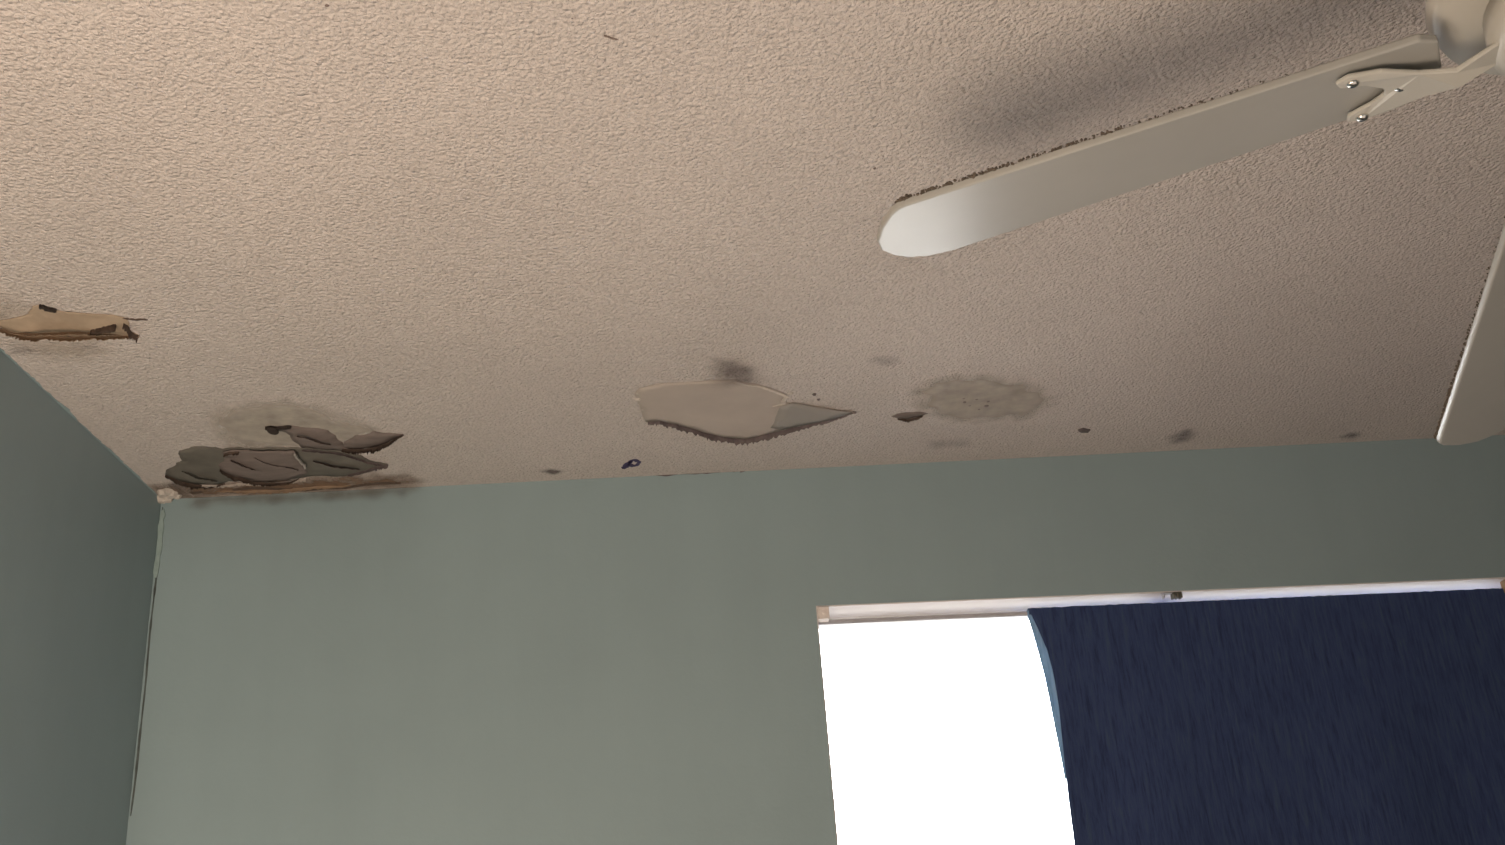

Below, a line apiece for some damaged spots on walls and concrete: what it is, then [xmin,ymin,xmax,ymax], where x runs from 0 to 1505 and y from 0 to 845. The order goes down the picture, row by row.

peeling [221,405,368,469]
peeling [634,379,856,446]
water stain [187,476,415,495]